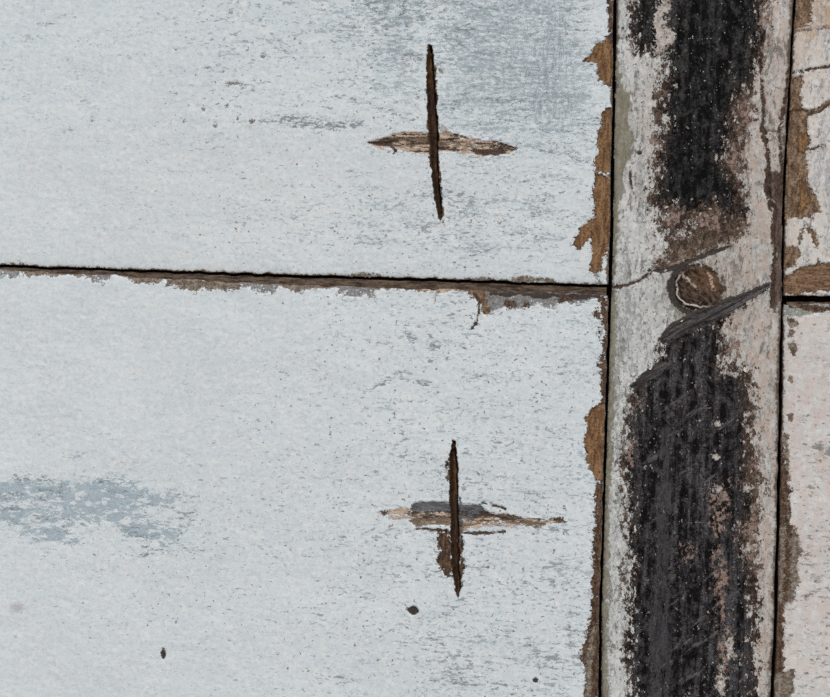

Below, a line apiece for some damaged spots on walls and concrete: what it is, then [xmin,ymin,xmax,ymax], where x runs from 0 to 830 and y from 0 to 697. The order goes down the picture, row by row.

peeling [794,0,814,29]
crack [364,44,518,220]
peeling [582,0,779,276]
peeling [129,277,320,295]
peeling [336,272,378,298]
peeling [485,75,830,697]
crack [380,440,571,597]